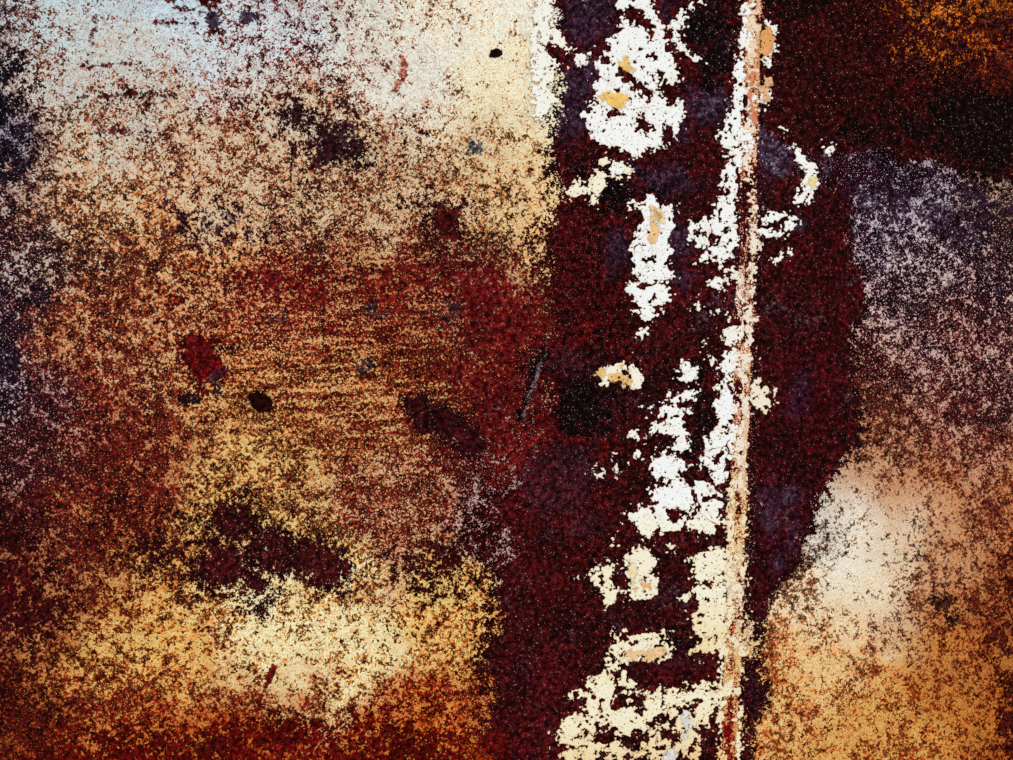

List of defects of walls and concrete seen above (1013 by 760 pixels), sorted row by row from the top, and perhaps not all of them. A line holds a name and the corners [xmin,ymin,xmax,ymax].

rust [0,26,52,225]
rust [0,251,58,422]
rust [0,502,91,756]
rust [28,0,745,760]
peeling [521,0,826,760]
rust [738,0,1013,760]